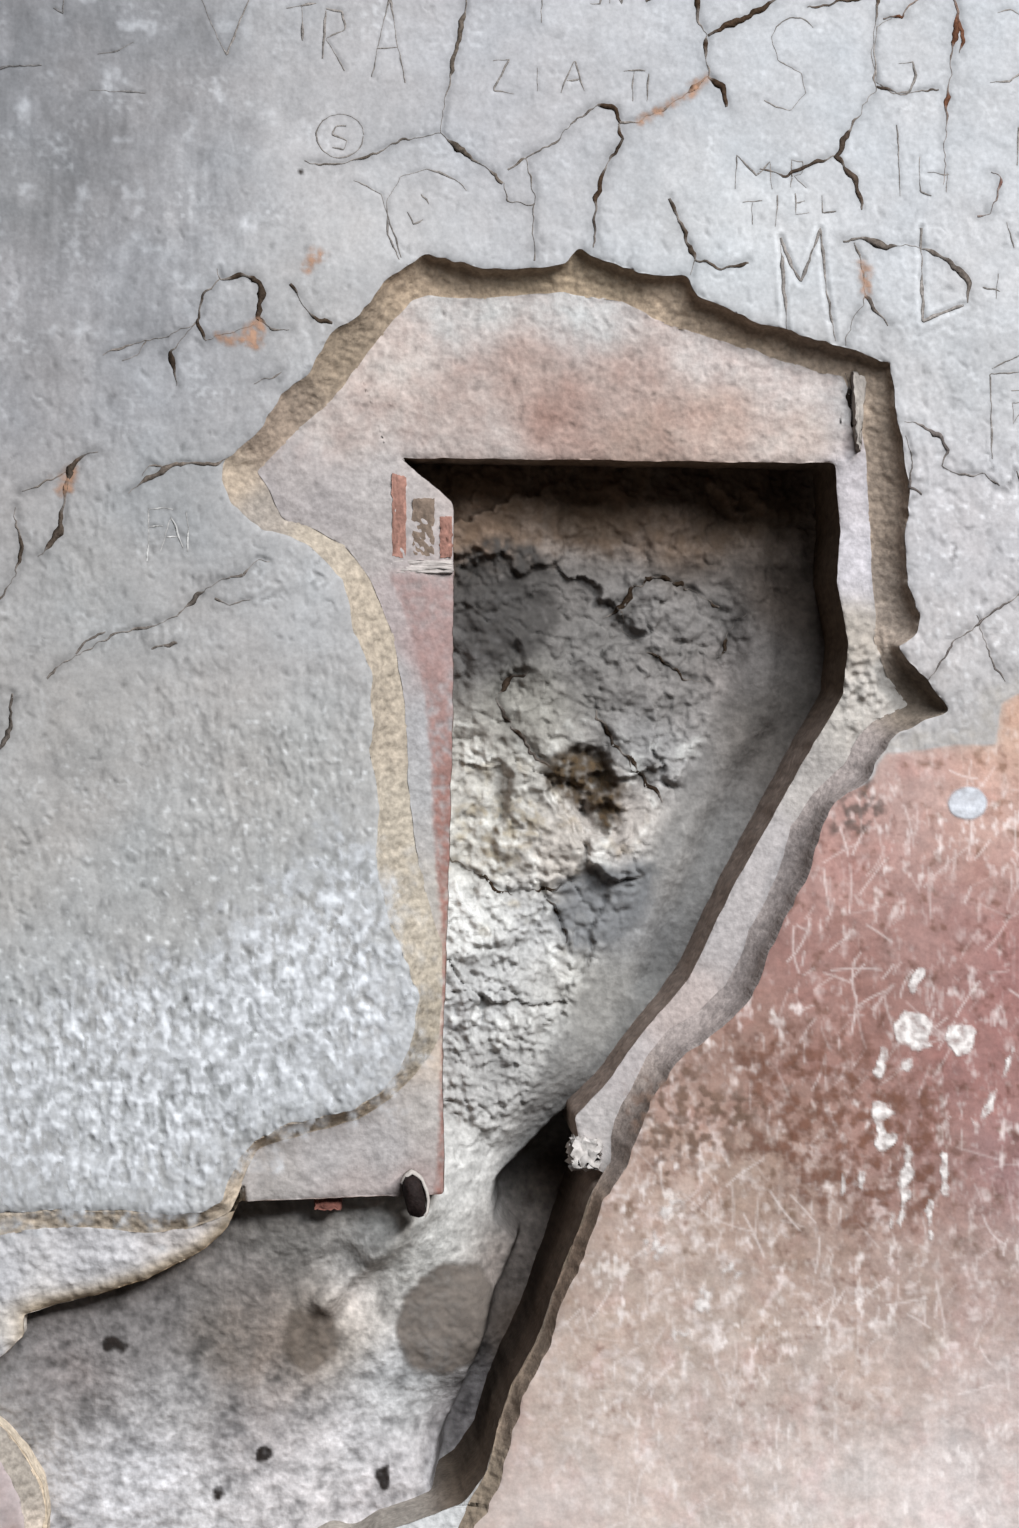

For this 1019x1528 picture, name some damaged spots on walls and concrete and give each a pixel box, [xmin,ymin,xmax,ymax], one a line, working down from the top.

crack [305,0,972,449]
crack [103,268,333,382]
crack [0,452,97,599]
crack [129,458,226,493]
crack [906,422,1019,495]
crack [47,559,270,679]
crack [604,575,746,682]
crack [929,594,1019,681]
crack [0,693,13,749]
crack [595,708,663,802]
flaking render [222,249,948,1528]
spalling [0,1425,48,1528]